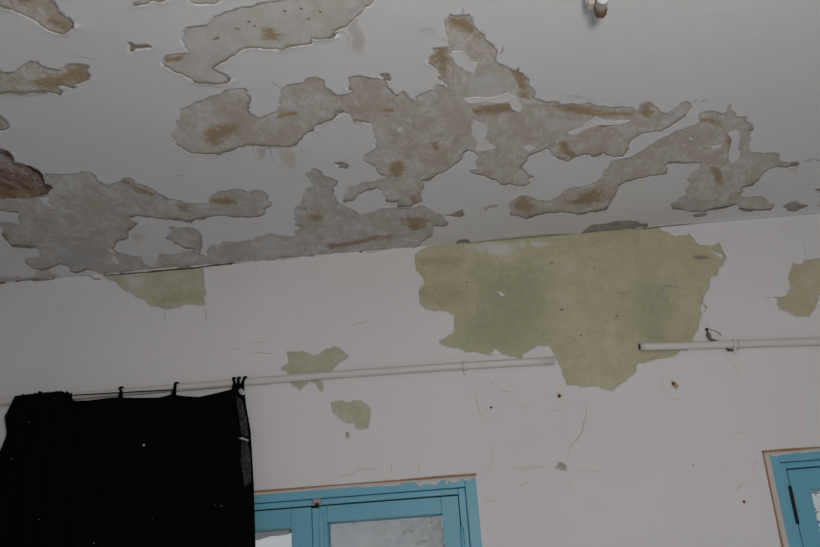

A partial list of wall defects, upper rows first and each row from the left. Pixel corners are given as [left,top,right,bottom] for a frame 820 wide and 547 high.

peeling [0,0,73,32]
peeling [0,15,799,392]
peeling [784,201,806,211]
peeling [777,259,820,317]
peeling [331,400,370,438]